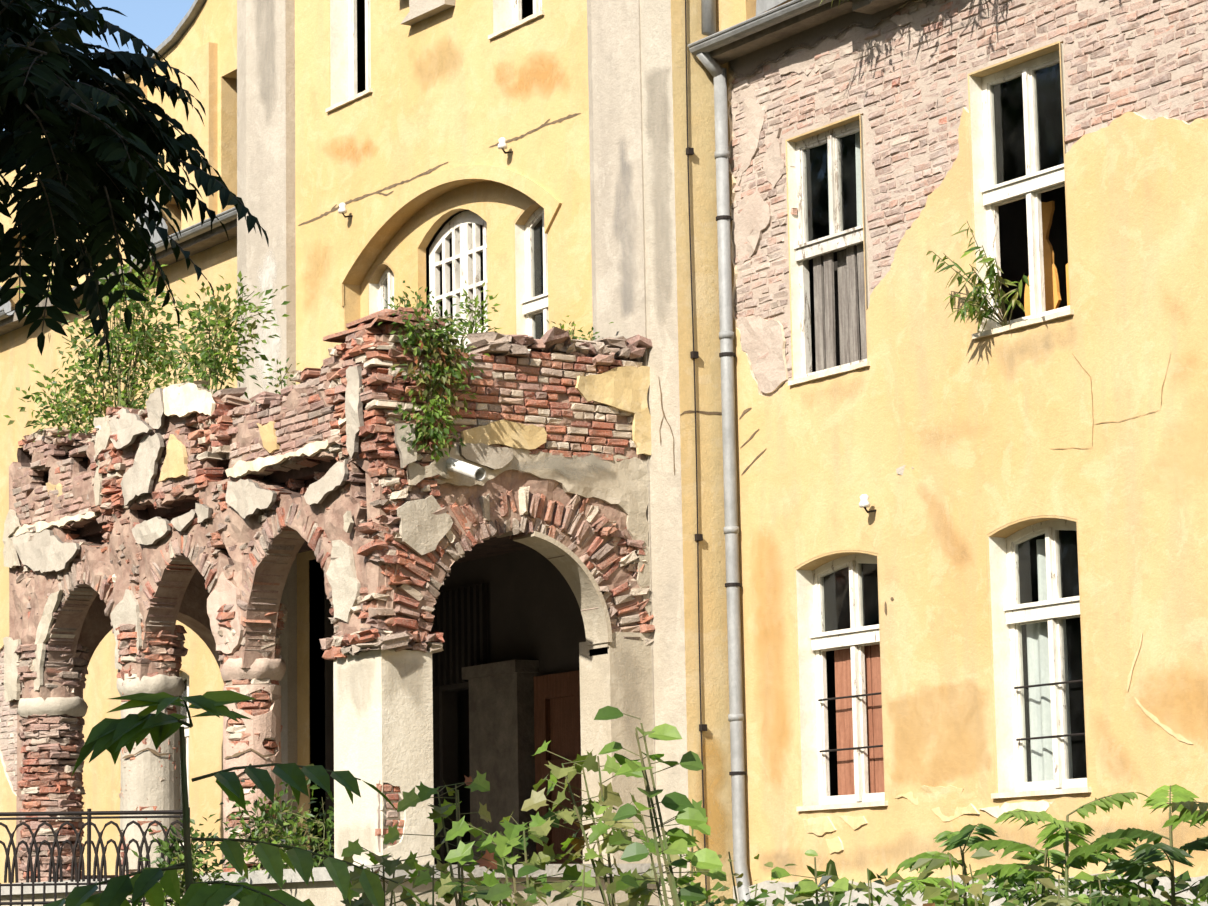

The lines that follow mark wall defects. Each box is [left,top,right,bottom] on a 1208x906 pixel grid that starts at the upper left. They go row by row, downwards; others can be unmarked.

flaking render [729,0,1208,397]
flaking render [3,383,216,573]
peeling [256,255,280,384]
flaking render [217,366,368,623]
flaking render [394,366,651,625]
crack [1049,353,1171,449]
flaking render [0,590,64,794]
flaking render [110,589,142,670]
flaking render [207,549,244,654]
flaking render [895,785,1054,822]